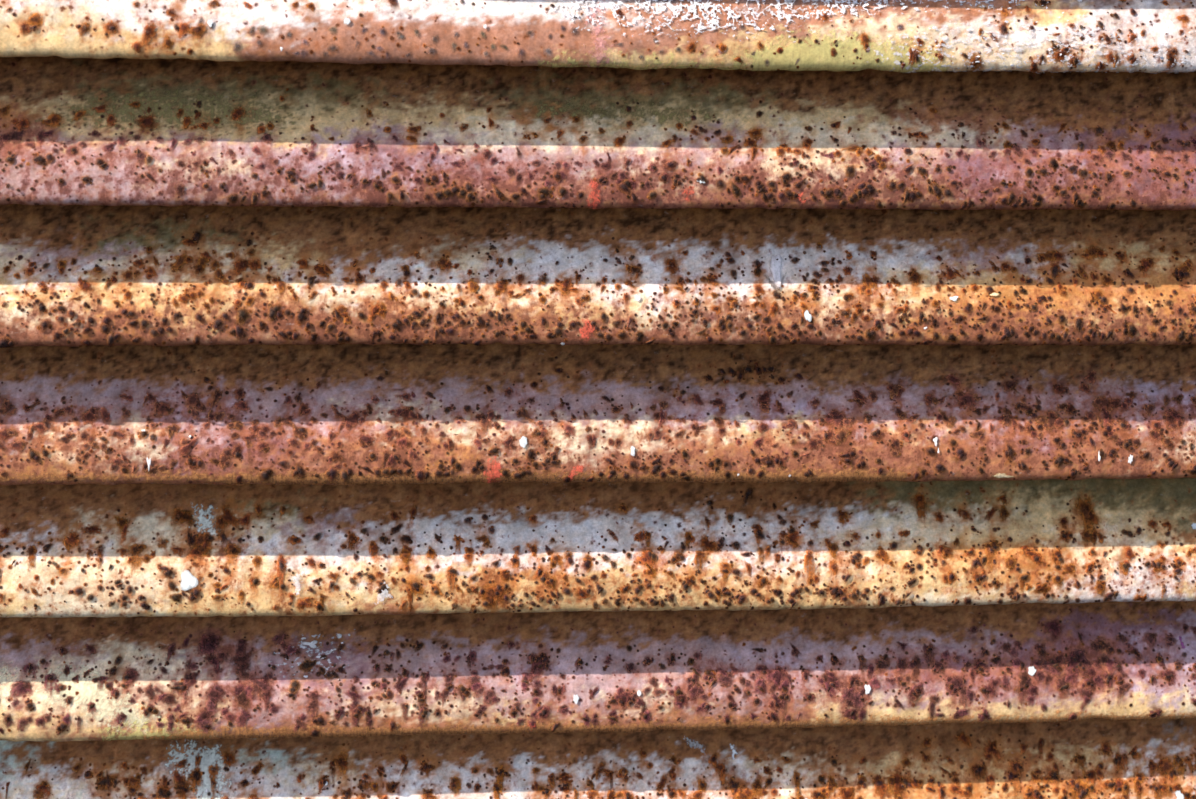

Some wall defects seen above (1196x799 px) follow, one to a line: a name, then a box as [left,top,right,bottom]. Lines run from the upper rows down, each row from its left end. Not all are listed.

corrosion [0,5,44,33]
corrosion [70,0,219,55]
corrosion [233,26,267,51]
corrosion [346,6,437,62]
corrosion [615,32,783,70]
corrosion [793,12,881,64]
corrosion [900,26,945,70]
corrosion [961,0,1194,73]
corrosion [0,98,1196,210]
corrosion [2,231,1196,347]
corrosion [0,356,1196,614]
corrosion [0,620,1196,799]